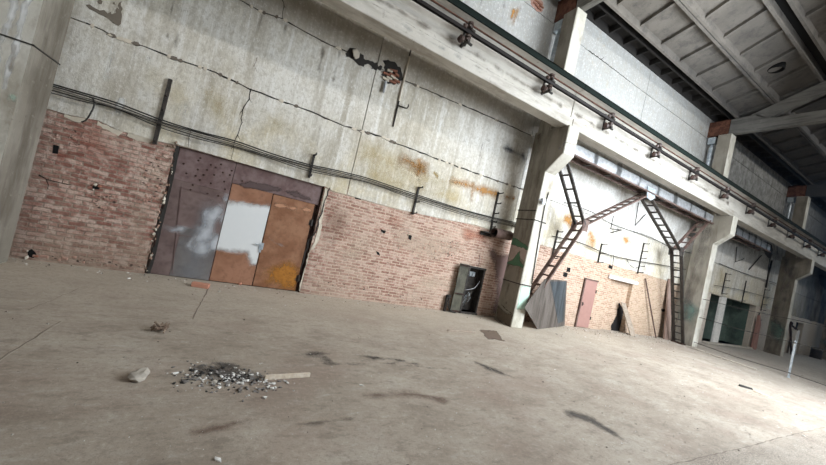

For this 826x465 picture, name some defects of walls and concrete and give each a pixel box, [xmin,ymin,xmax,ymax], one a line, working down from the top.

peeling [86,0,140,46]
spalling [346,48,403,93]
peeling [51,114,88,154]
crack [231,88,252,159]
rust [401,157,438,177]
rust [454,180,514,199]